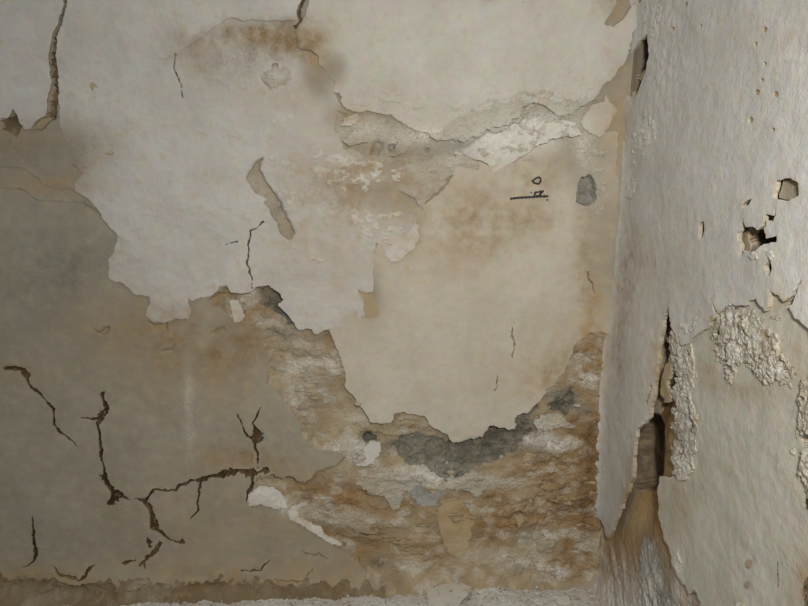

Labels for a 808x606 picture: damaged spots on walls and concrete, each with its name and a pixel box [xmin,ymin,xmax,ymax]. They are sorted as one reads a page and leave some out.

crack [47,0,67,119]
crack [293,0,305,29]
crack [226,221,264,279]
flaking render [0,0,620,606]
flaking render [298,0,808,606]
crack [0,362,274,574]
crack [19,513,99,586]